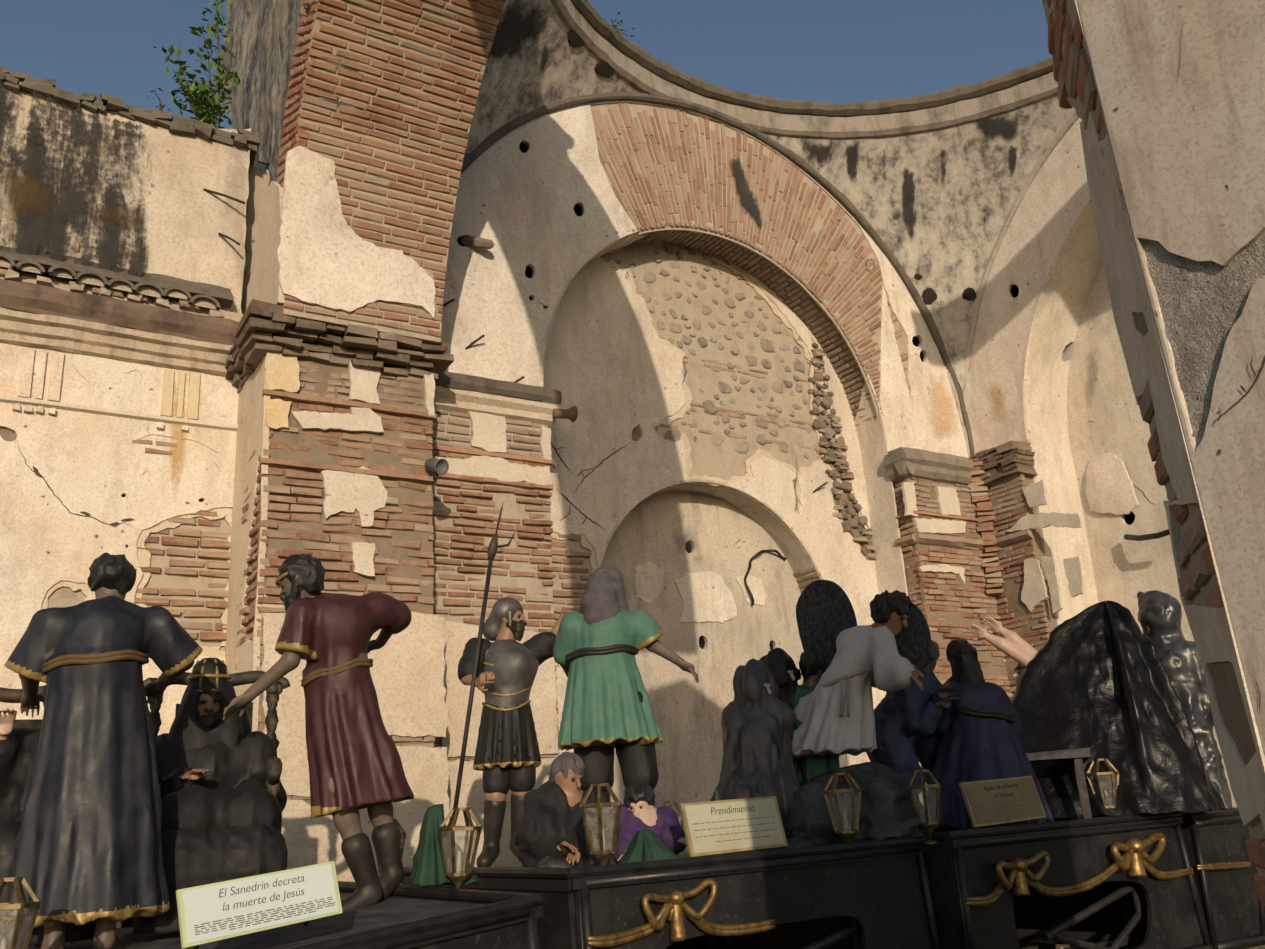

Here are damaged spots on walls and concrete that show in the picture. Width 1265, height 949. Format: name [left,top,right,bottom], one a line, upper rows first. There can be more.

damp [0,80,149,277]
flaking render [277,146,436,319]
damp [802,136,859,180]
damp [902,169,917,236]
damp [976,116,1018,174]
flaking render [599,242,877,559]
crack [1214,355,1265,422]
crack [17,443,134,526]
flaking render [320,466,387,577]
crack [551,442,632,531]
flaking render [902,481,966,534]
flaking render [126,499,232,658]